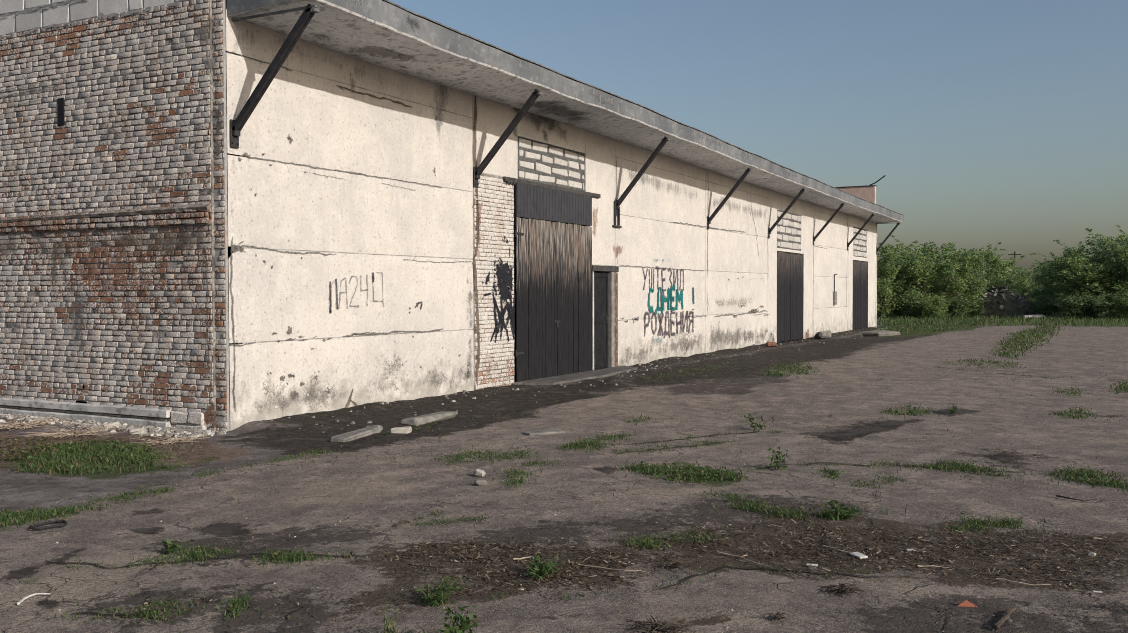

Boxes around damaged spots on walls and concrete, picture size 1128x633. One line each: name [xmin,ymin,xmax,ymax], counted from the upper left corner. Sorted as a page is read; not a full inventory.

peeling [45,25,85,56]
peeling [55,251,180,329]
peeling [187,285,212,338]
damp [626,326,764,363]
damp [276,390,335,408]